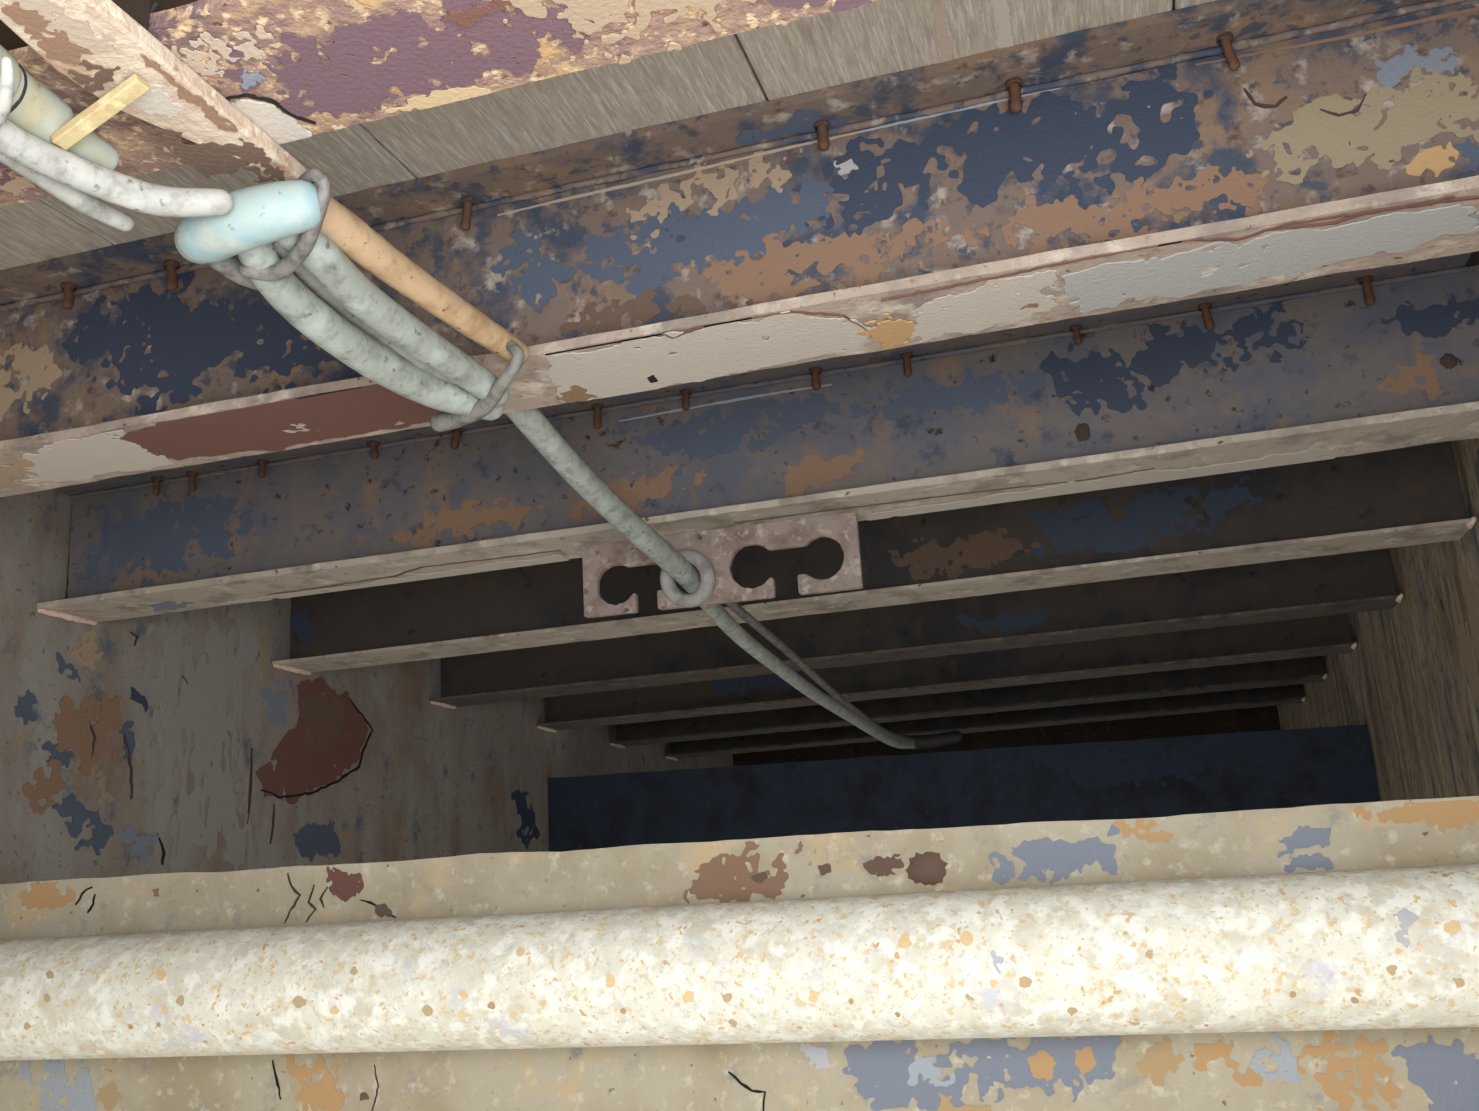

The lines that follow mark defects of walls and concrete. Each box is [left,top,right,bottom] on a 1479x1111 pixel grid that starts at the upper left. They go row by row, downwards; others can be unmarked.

corrosion [626,148,803,240]
peeling [497,87,1063,216]
corrosion [703,64,1479,309]
corrosion [557,385,597,403]
corrosion [559,288,708,337]
peeling [546,311,872,402]
peeling [909,204,1479,343]
peeling [21,430,174,483]
peeling [866,447,1347,520]
peeling [146,554,569,873]
spalling [818,863,831,876]
crack [728,1071,766,1111]